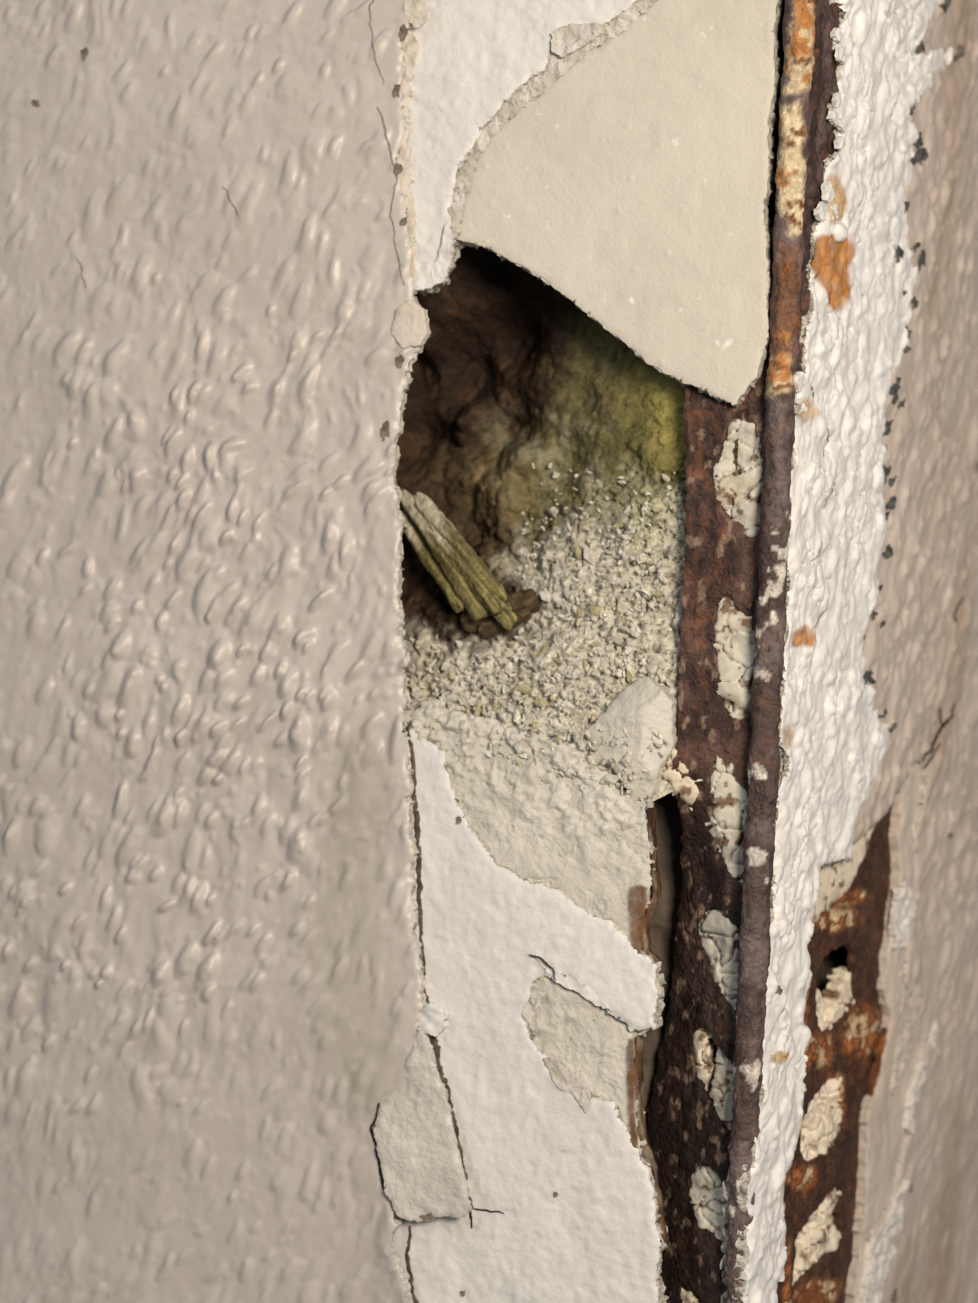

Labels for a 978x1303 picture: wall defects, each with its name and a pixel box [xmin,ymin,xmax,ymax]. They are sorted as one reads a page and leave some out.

peeling [814,181,838,222]
rust [811,176,854,309]
flaking render [380,0,782,930]
rust [794,626,816,646]
crack [406,722,430,1003]
rust [629,807,663,963]
crack [369,1102,419,1303]
peeling [373,1002,472,1222]
crack [428,1035,504,1228]
peeling [521,954,639,1147]
rust [627,1036,669,1243]
peeling [845,764,939,1303]